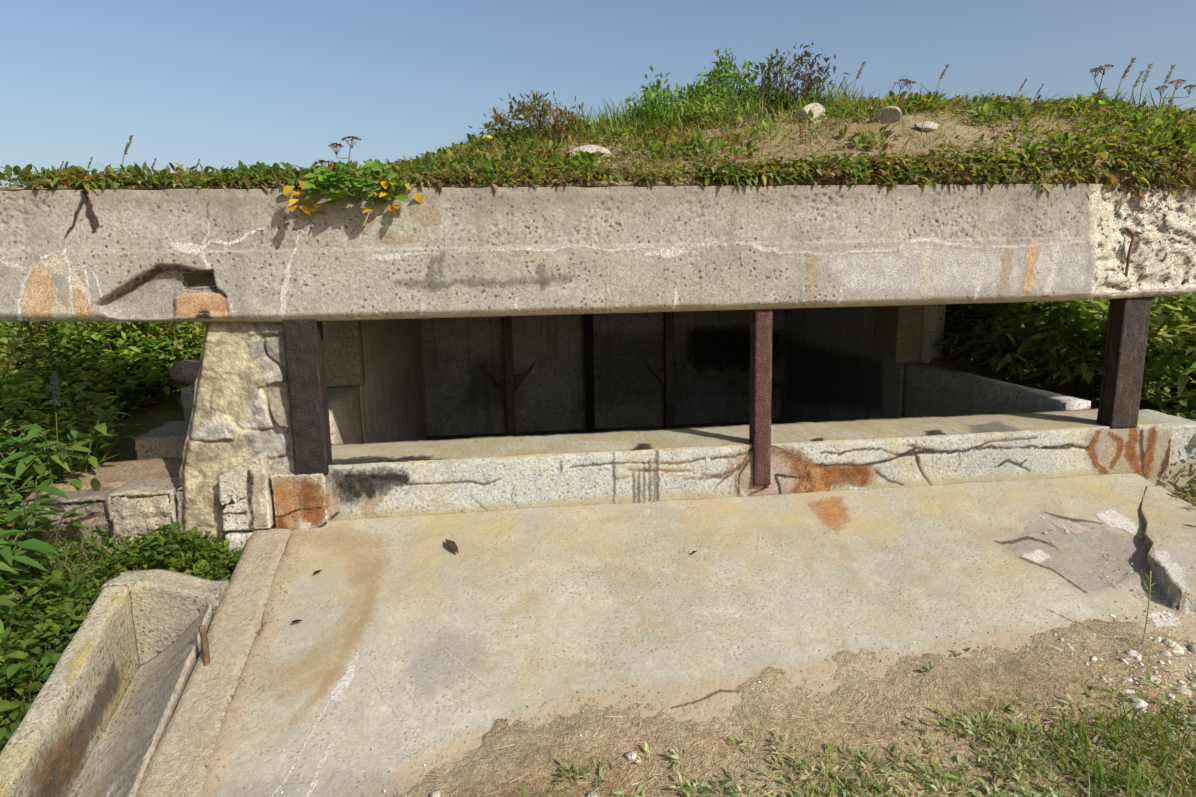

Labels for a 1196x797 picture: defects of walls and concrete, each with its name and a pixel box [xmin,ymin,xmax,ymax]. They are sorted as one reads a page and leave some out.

crack [168,211,265,272]
spalling [1087,185,1196,297]
rust [16,248,103,321]
spalling [94,263,234,320]
rust [254,470,340,531]
crack [407,478,501,512]
crack [570,453,747,493]
rust [702,446,877,531]
rust [1042,427,1172,478]
peeling [996,536,1087,593]
peeling [1146,550,1191,628]
damp [269,650,359,797]